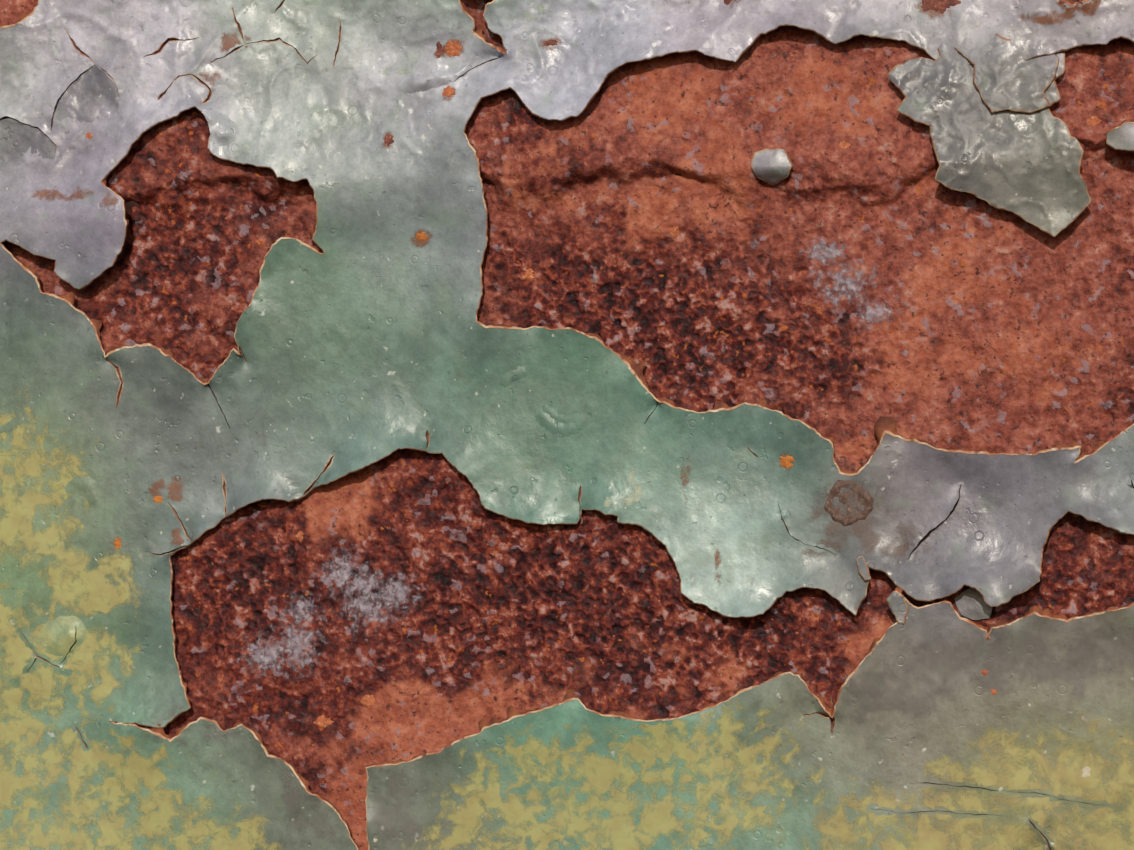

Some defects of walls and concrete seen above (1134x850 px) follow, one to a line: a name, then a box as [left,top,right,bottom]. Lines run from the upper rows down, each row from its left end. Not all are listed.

crack [145,37,200,57]
rust [222,34,249,51]
crack [158,7,342,104]
rust [442,86,456,98]
rust [412,230,430,246]
rust [463,24,1134,476]
spalling [824,480,874,526]
rust [109,447,1134,850]